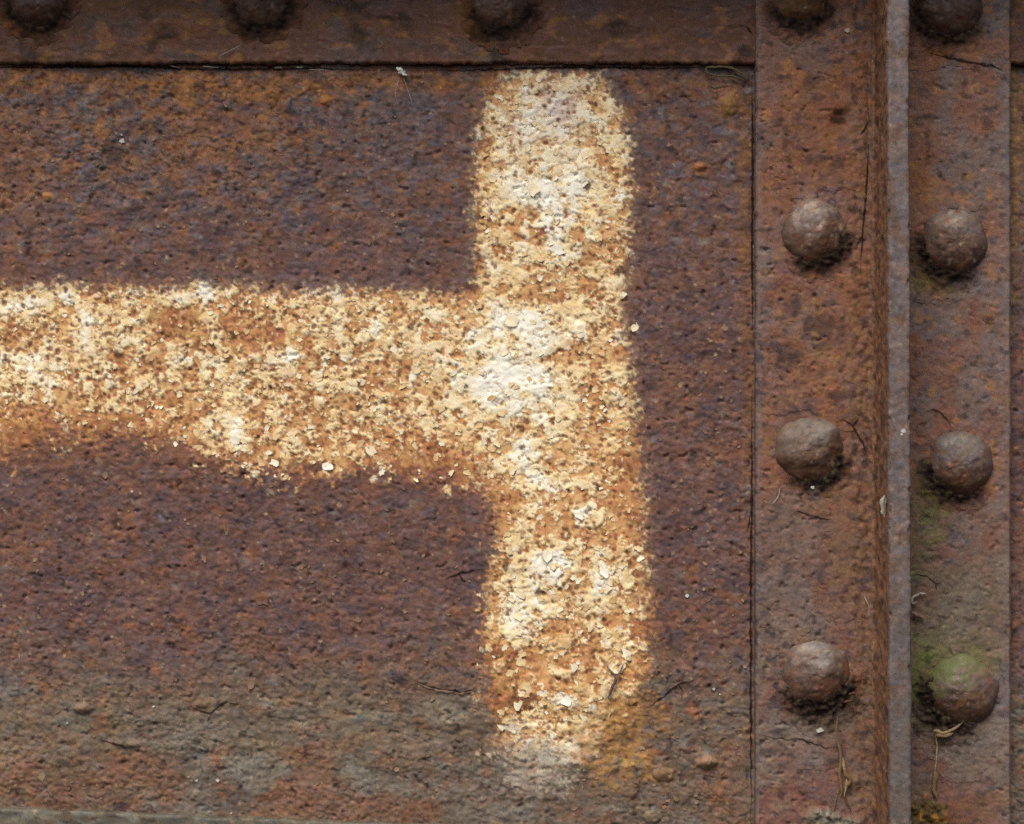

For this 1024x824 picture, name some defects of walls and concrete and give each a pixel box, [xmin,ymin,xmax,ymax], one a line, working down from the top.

corrosion [0,64,506,230]
corrosion [759,42,868,200]
corrosion [908,25,1024,343]
peeling [11,297,78,340]
peeling [0,362,100,426]
corrosion [0,400,232,502]
peeling [104,297,403,480]
corrosion [361,434,518,527]
peeling [390,77,644,733]
corrosion [547,279,833,824]
corrosion [767,244,869,438]
corrosion [470,642,524,738]